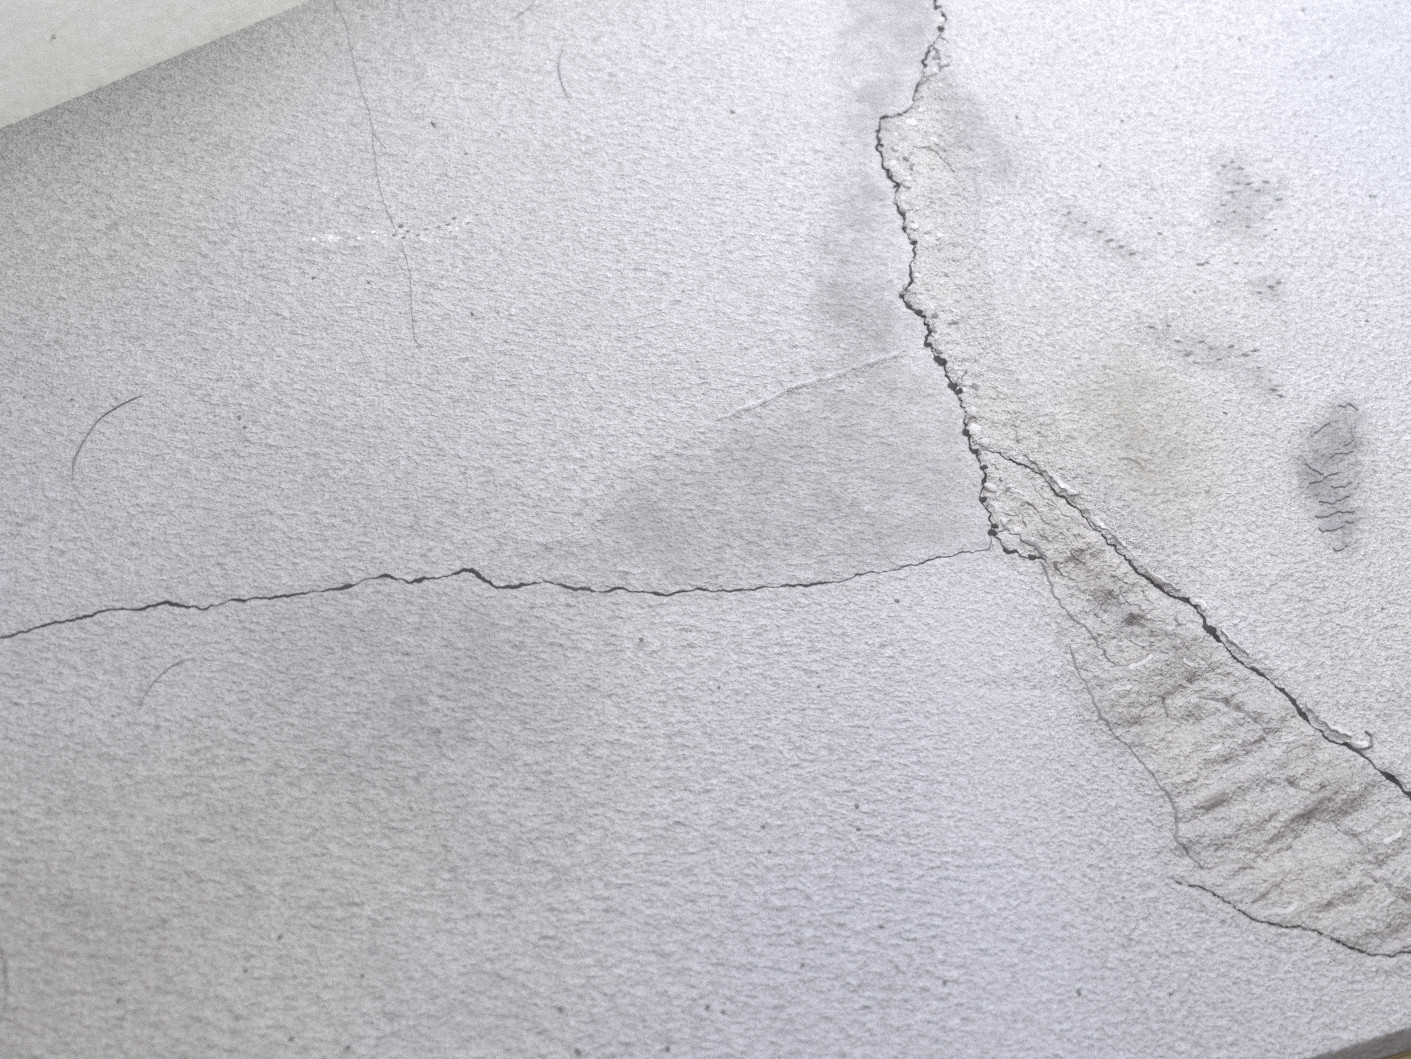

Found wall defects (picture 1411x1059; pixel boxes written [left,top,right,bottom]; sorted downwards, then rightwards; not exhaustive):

crack [0,0,1411,801]
spalling [878,17,1411,978]
crack [1069,644,1411,958]
water stain [1305,401,1359,551]